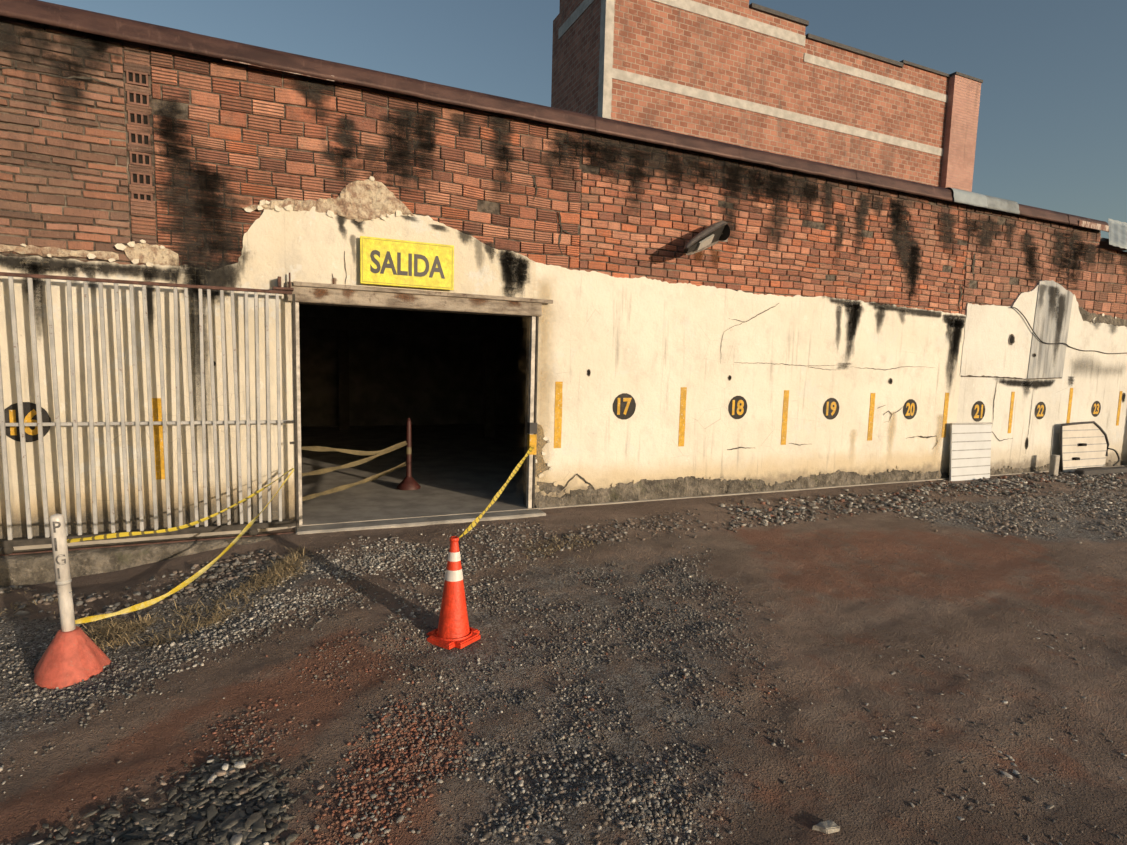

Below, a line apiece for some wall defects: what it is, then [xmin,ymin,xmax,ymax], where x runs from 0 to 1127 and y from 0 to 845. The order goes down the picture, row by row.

leakage [0,22,112,108]
leakage [290,78,438,184]
leakage [485,116,513,192]
peeling [87,240,154,267]
leakage [0,97,246,400]
flaking render [244,176,415,222]
leakage [337,215,363,233]
leakage [485,242,529,297]
leakage [542,129,966,385]
leakage [937,213,1127,354]
crack [720,303,934,370]
flaking render [535,424,947,508]